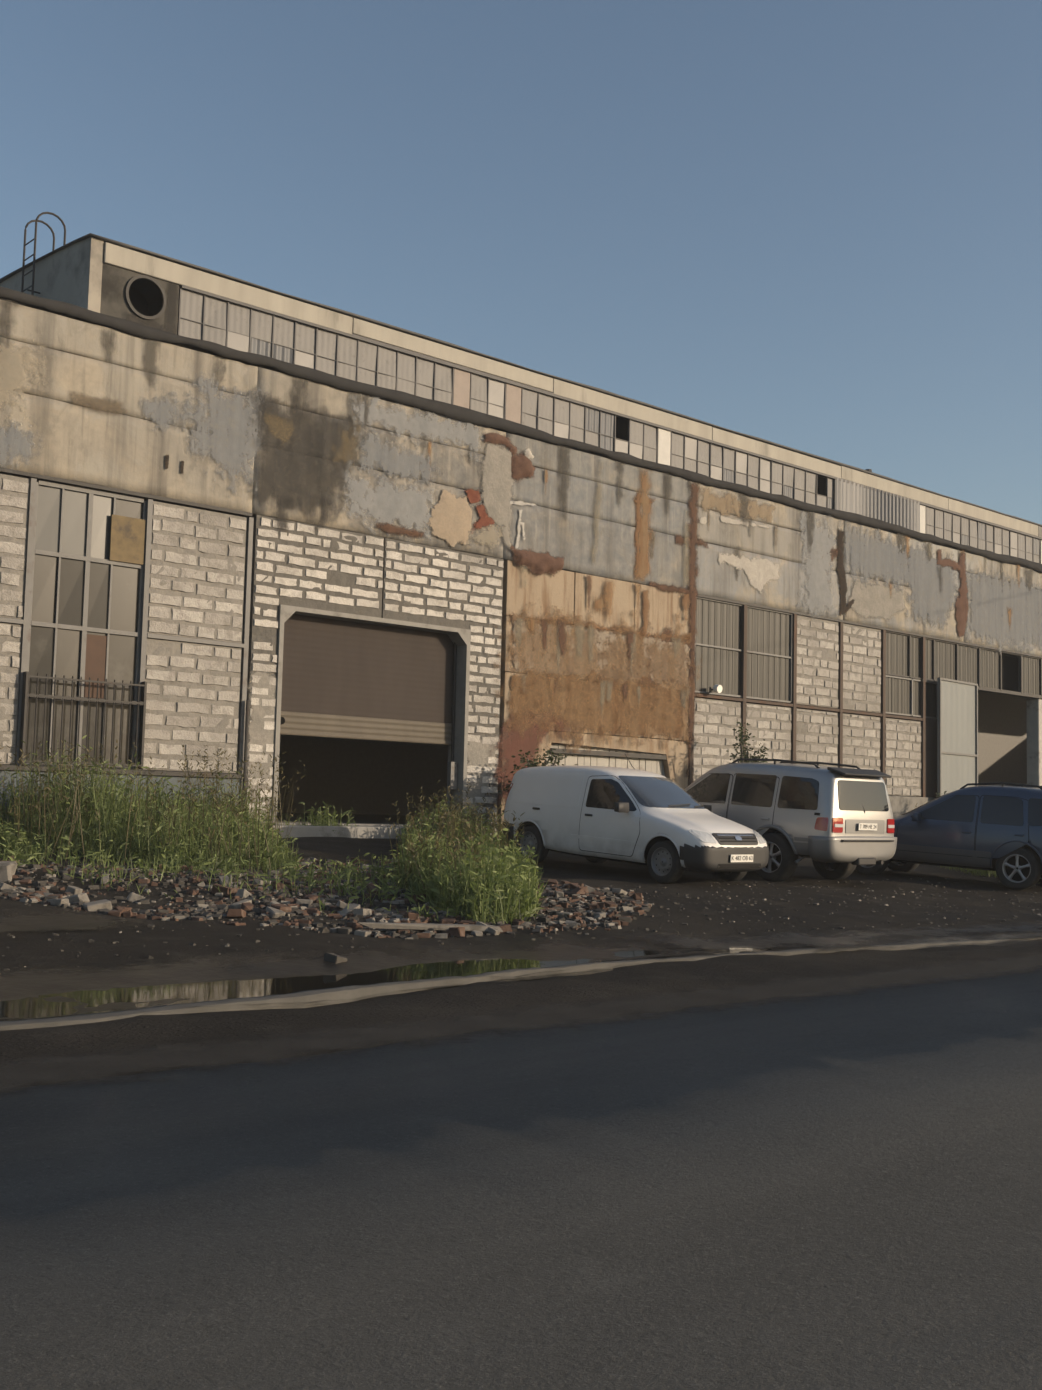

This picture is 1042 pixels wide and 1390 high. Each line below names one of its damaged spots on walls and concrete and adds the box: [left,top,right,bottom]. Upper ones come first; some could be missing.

water stain [251,379,369,529]
peeling [344,397,515,548]
corrosion [509,473,709,776]
corrosion [937,550,969,637]